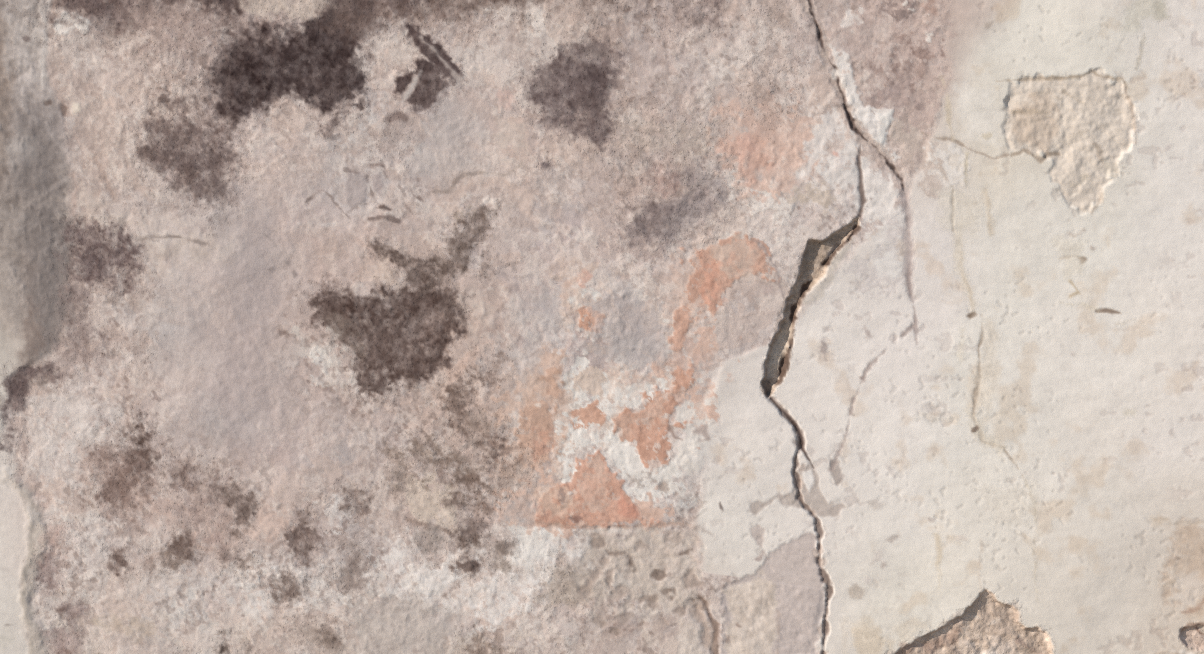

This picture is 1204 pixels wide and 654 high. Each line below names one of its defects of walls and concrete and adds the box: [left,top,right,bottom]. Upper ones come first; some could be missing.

peeling [21,165,219,281]
peeling [304,162,402,225]
peeling [361,243,404,283]
water stain [0,0,826,654]
peeling [369,0,1147,654]
crack [767,0,921,654]
crack [919,72,1011,185]
peeling [133,492,365,628]
crack [669,593,722,654]
peeling [1148,508,1204,654]